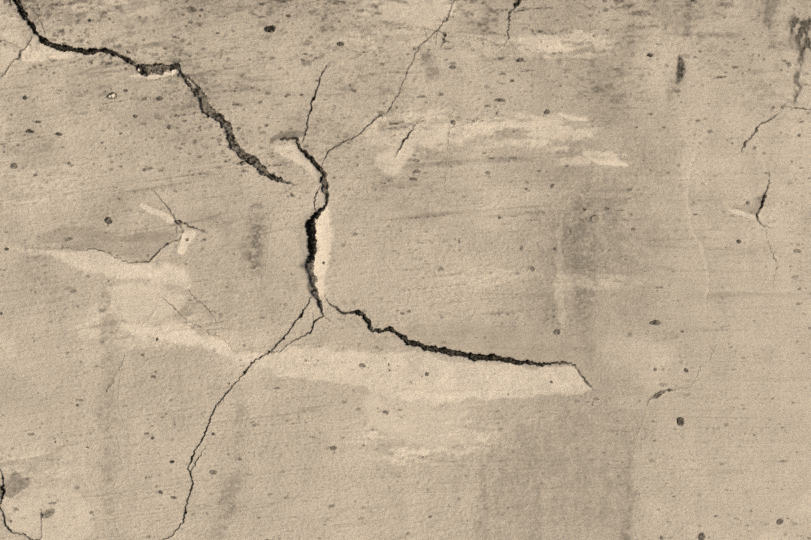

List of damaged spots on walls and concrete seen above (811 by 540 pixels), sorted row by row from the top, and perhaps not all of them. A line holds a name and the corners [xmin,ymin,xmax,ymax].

leakage [758,0,808,105]
crack [740,93,811,154]
crack [0,0,601,540]
crack [755,170,780,286]